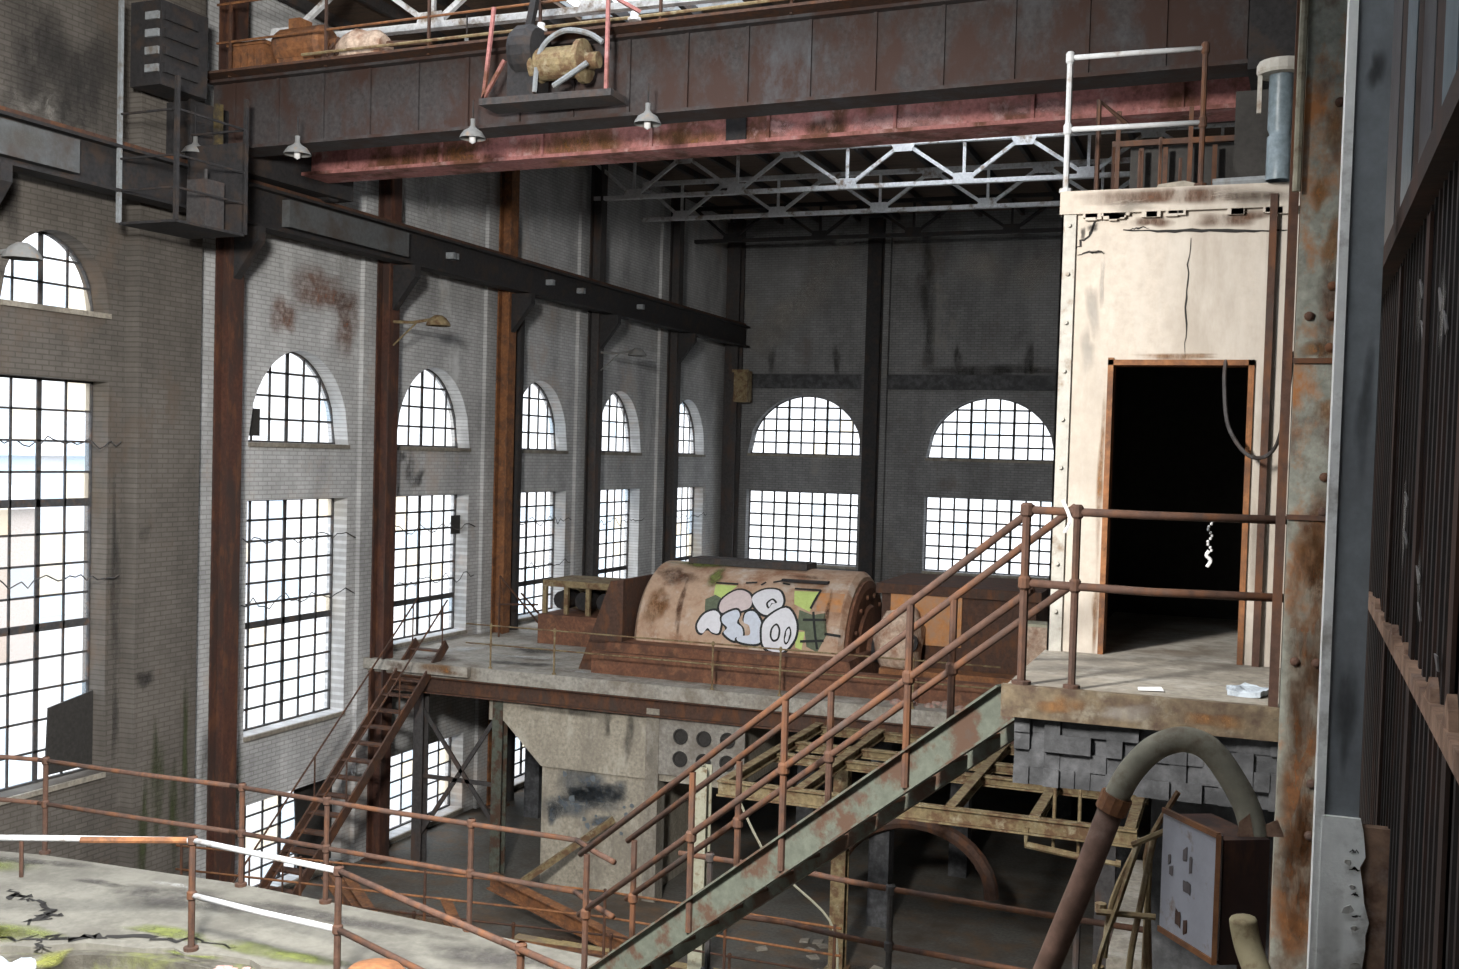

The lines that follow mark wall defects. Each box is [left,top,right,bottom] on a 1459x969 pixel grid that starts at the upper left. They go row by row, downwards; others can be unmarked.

rust [393,143,490,165]
rust [536,135,615,153]
crack [1076,221,1287,351]
rust [1306,226,1338,357]
rust [1278,511,1325,958]
damp [0,858,117,885]
damp [133,702,415,932]
damp [448,948,542,965]